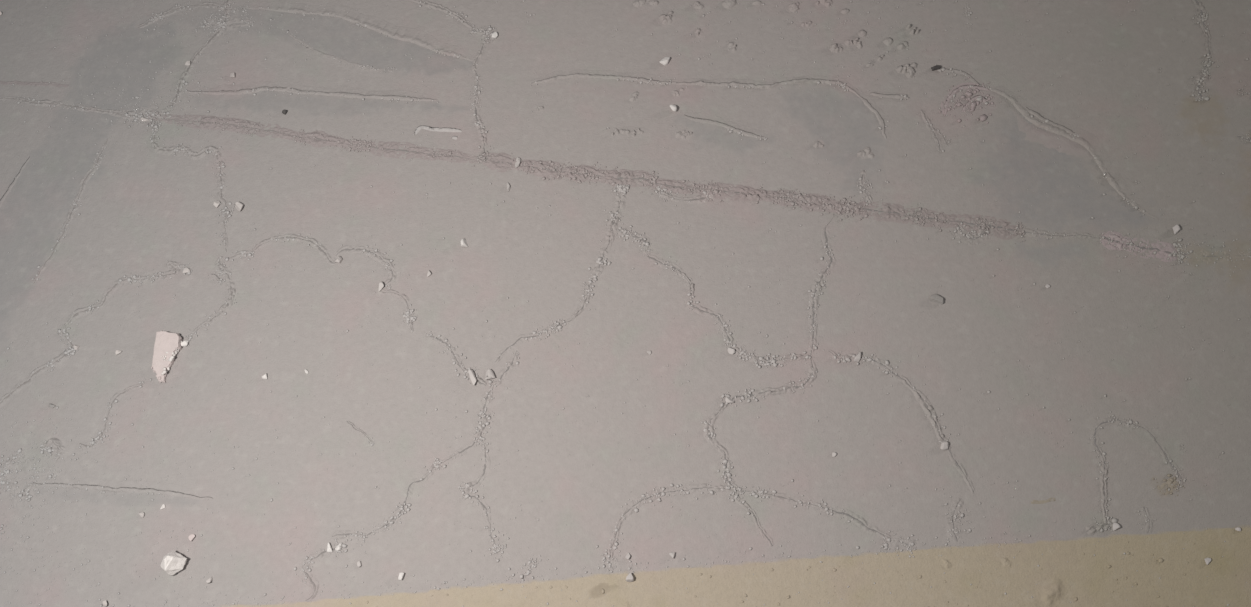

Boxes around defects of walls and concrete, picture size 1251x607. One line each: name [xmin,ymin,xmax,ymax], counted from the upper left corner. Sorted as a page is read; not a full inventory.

crack [0,0,1193,363]
crack [0,261,192,408]
crack [293,331,541,602]
crack [602,216,918,571]
crack [828,350,975,542]
crack [1086,411,1186,536]